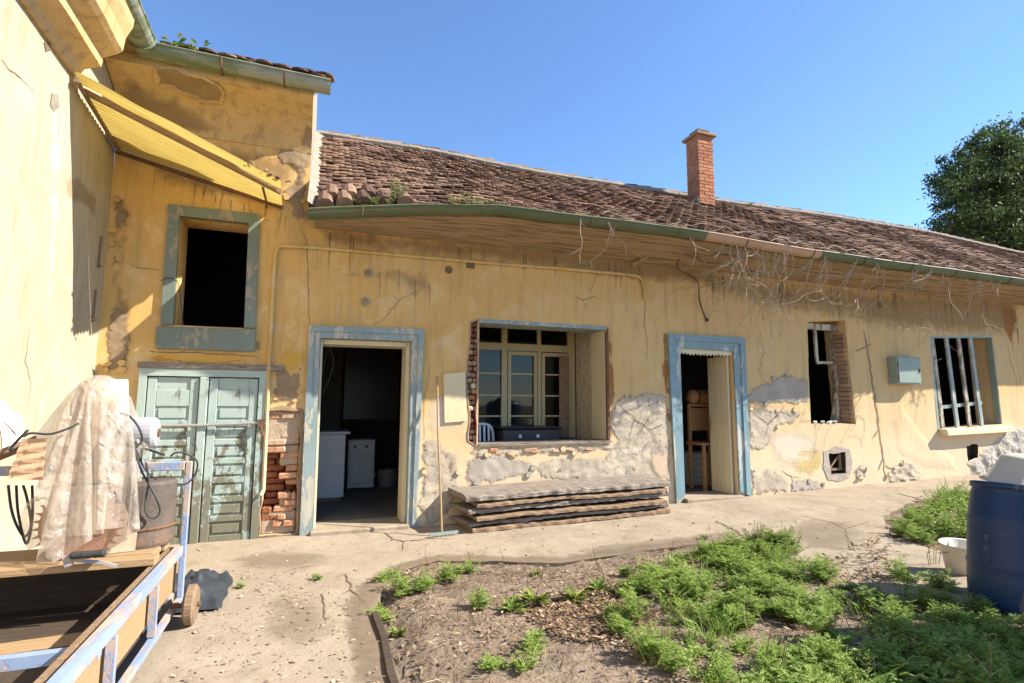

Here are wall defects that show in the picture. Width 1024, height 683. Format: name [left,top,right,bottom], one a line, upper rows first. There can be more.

spalling [279,126,312,220]
peeling [100,308,131,374]
flaking render [258,351,305,538]
spalling [419,440,462,525]
spalling [473,392,671,480]
crack [618,404,661,452]
spalling [748,396,800,450]
spalling [888,460,923,483]